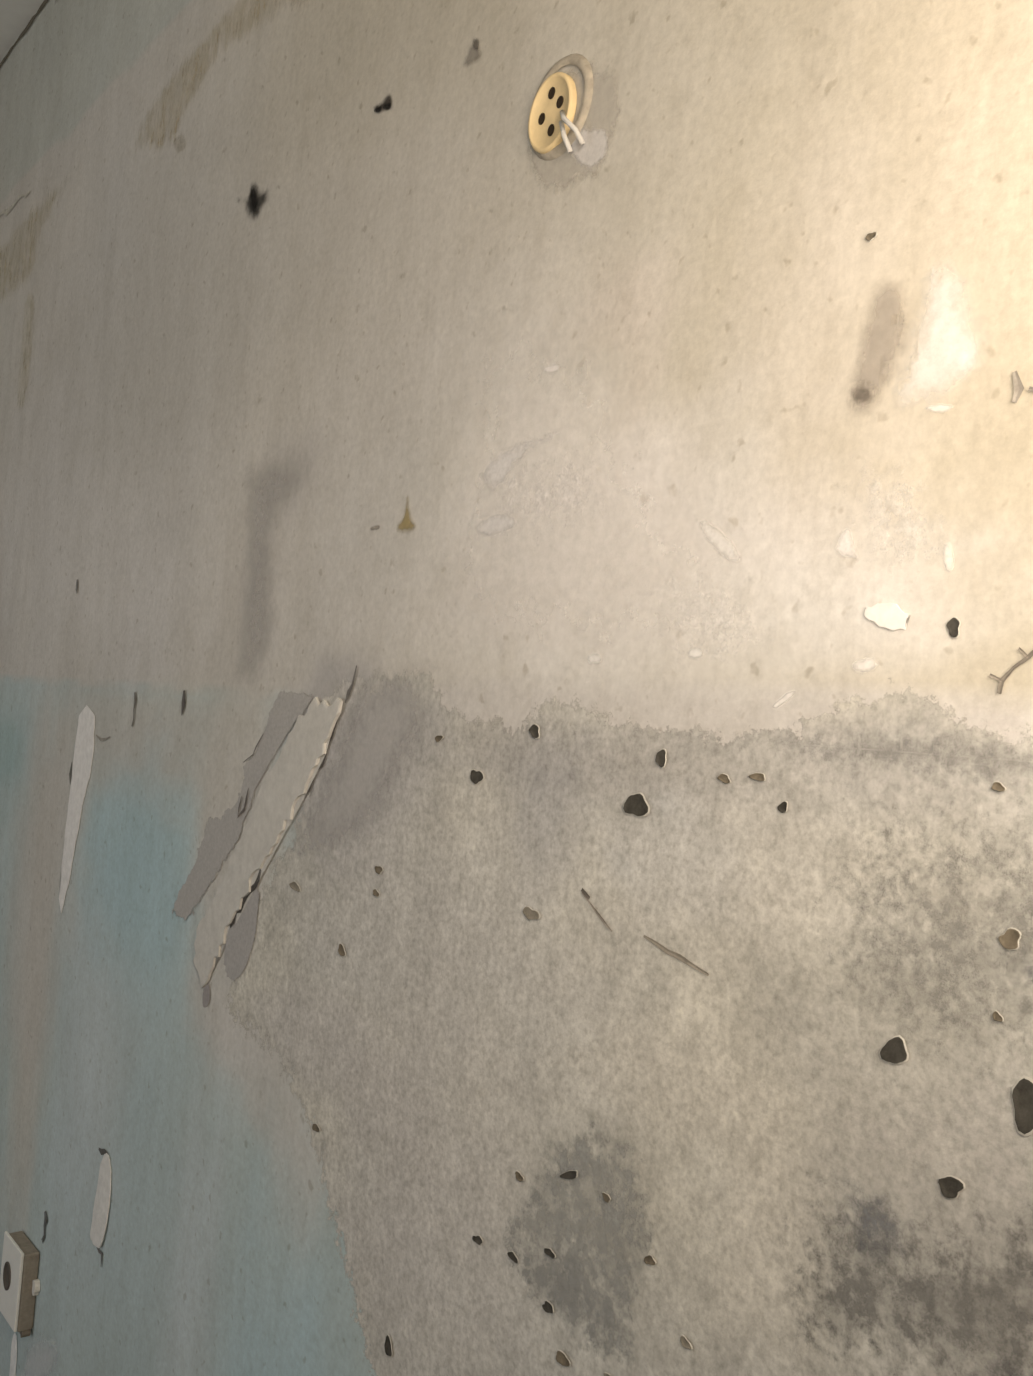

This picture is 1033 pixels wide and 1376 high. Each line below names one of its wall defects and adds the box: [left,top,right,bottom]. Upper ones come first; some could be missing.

peeling [864,603,910,631]
spalling [946,617,961,639]
peeling [59,705,110,913]
spalling [172,665,1033,1376]
peeling [90,1148,111,1265]
leakage [509,1135,652,1360]
leakage [799,1199,1033,1376]